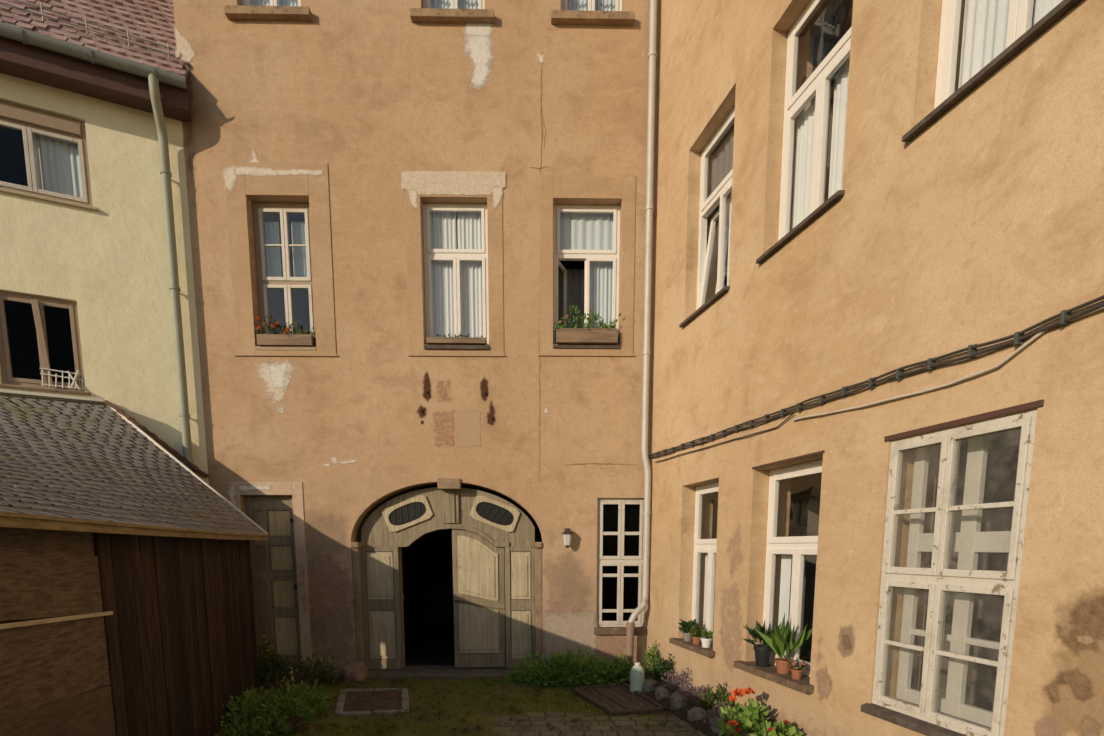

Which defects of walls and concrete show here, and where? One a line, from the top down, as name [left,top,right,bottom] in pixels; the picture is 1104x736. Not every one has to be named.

peeling [465,23,493,88]
peeling [257,362,295,413]
spalling [838,627,854,656]
spalling [1036,594,1104,736]